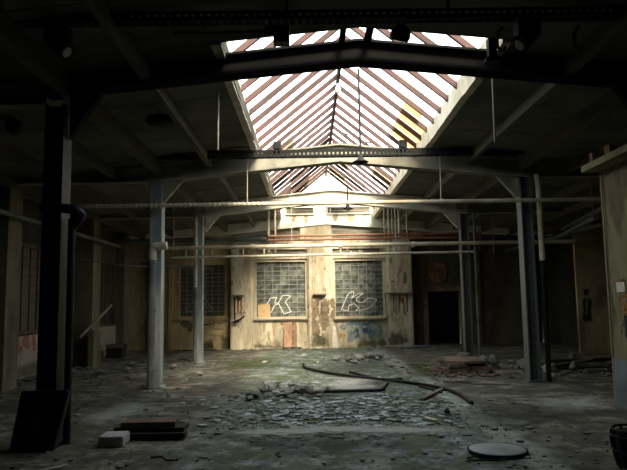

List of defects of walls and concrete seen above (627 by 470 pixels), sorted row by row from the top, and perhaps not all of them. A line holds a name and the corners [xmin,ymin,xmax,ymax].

peeling [311,298,336,336]